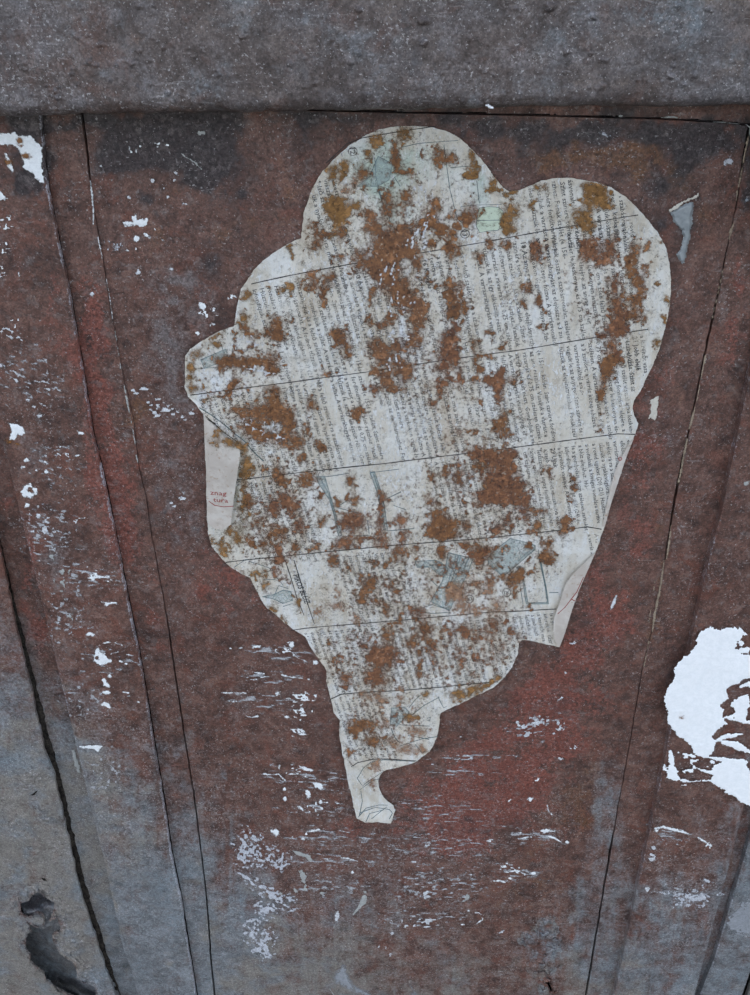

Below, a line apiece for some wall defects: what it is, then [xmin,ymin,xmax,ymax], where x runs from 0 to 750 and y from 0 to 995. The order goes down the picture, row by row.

crack [740,127,749,170]
rust [567,182,662,433]
rust [186,126,579,791]
crack [0,540,121,995]
rust [517,913,563,995]
crack [585,838,612,995]